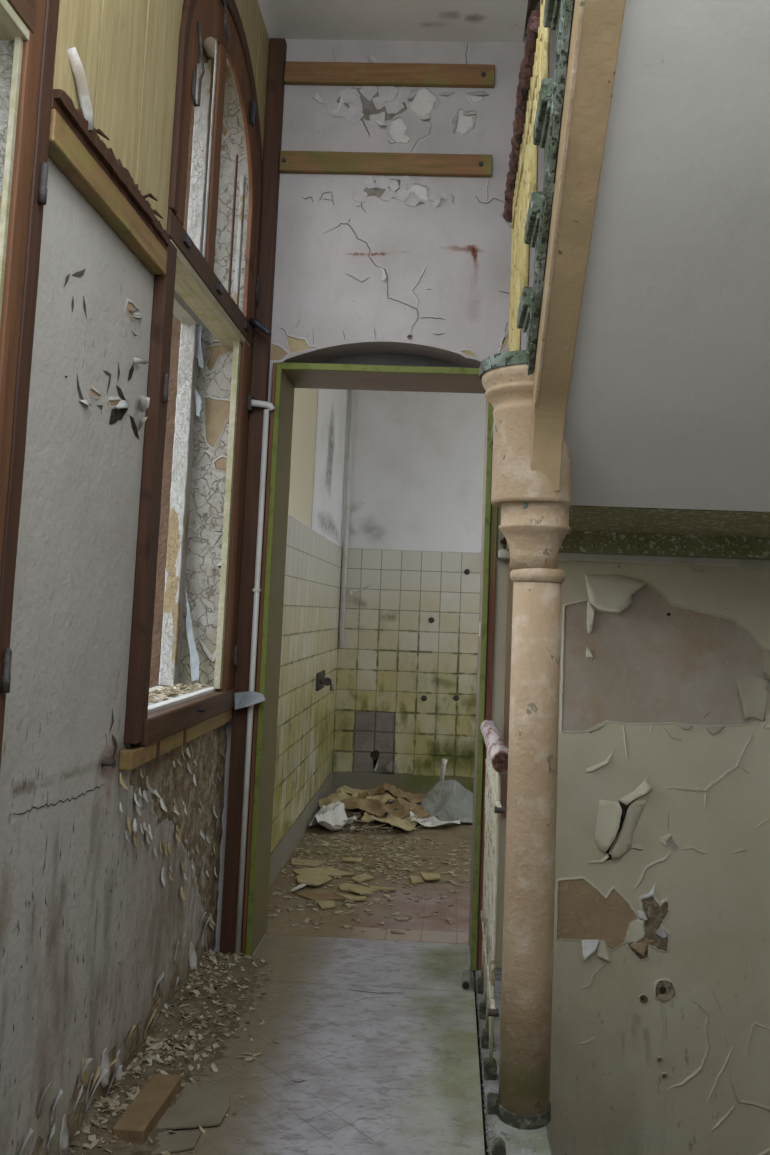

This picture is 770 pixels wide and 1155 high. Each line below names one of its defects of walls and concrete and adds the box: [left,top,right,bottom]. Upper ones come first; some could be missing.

peeling [328,86,488,144]
peeling [352,175,447,207]
crack [301,191,446,335]
peeling [124,298,143,337]
peeling [65,352,150,439]
peeling [203,396,230,473]
peeling [106,708,120,761]
peeling [554,566,770,963]
flaking render [12,725,227,1155]